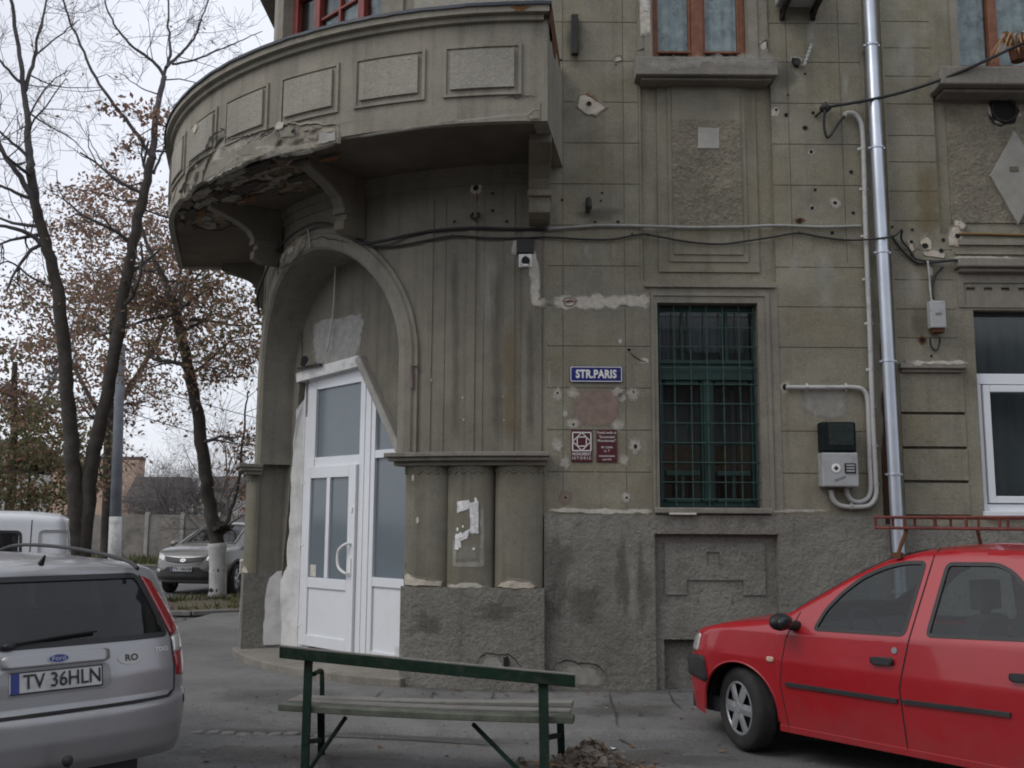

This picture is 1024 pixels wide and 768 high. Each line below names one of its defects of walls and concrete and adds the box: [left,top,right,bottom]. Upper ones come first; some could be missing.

flaking render [575,92,609,118]
flaking render [174,121,341,231]
flaking render [907,219,1012,277]
crack [477,652,521,666]
crack [553,658,606,678]
damp [562,666,601,686]